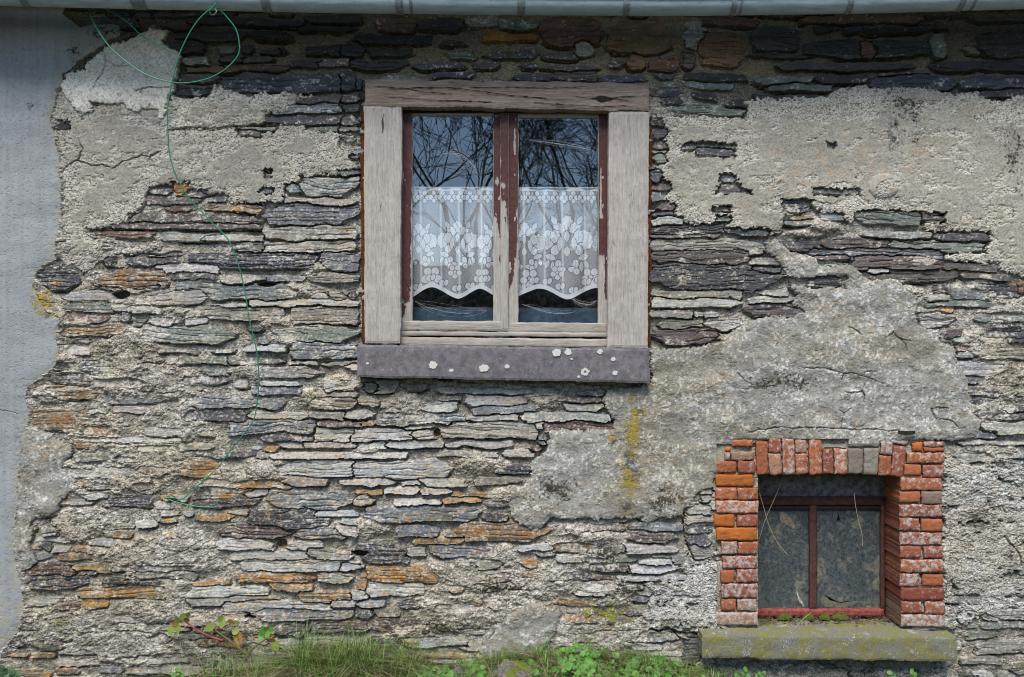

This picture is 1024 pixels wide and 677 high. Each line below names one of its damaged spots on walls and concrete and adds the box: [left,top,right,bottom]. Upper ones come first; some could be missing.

flaking render [51,27,360,274]
peeling [113,291,131,300]
flaking render [125,85,1024,633]
flaking render [13,426,75,588]
flaking render [478,601,561,662]